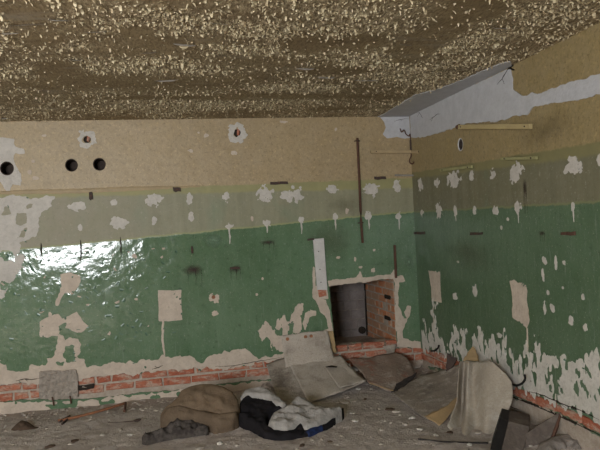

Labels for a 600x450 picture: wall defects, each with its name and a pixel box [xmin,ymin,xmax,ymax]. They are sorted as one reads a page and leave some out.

peeling [0,0,600,144]
peeling [0,137,55,299]
peeling [0,255,600,450]